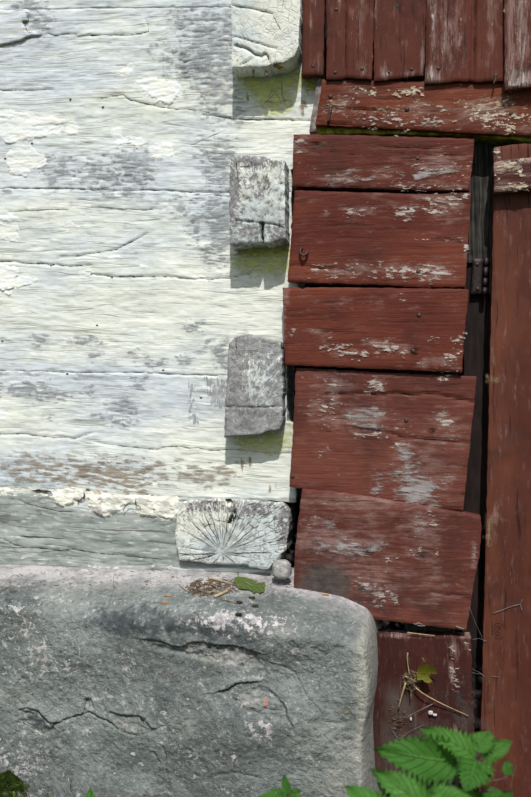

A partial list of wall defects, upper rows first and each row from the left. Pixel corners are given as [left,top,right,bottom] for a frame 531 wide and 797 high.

peeling [0,109,81,179]
peeling [117,62,183,107]
leakage [147,4,316,274]
peeling [339,86,457,136]
peeling [465,73,531,135]
peeling [0,263,39,296]
leakage [0,427,293,495]
spalling [0,486,181,521]
crack [2,502,281,564]
crack [22,698,152,736]